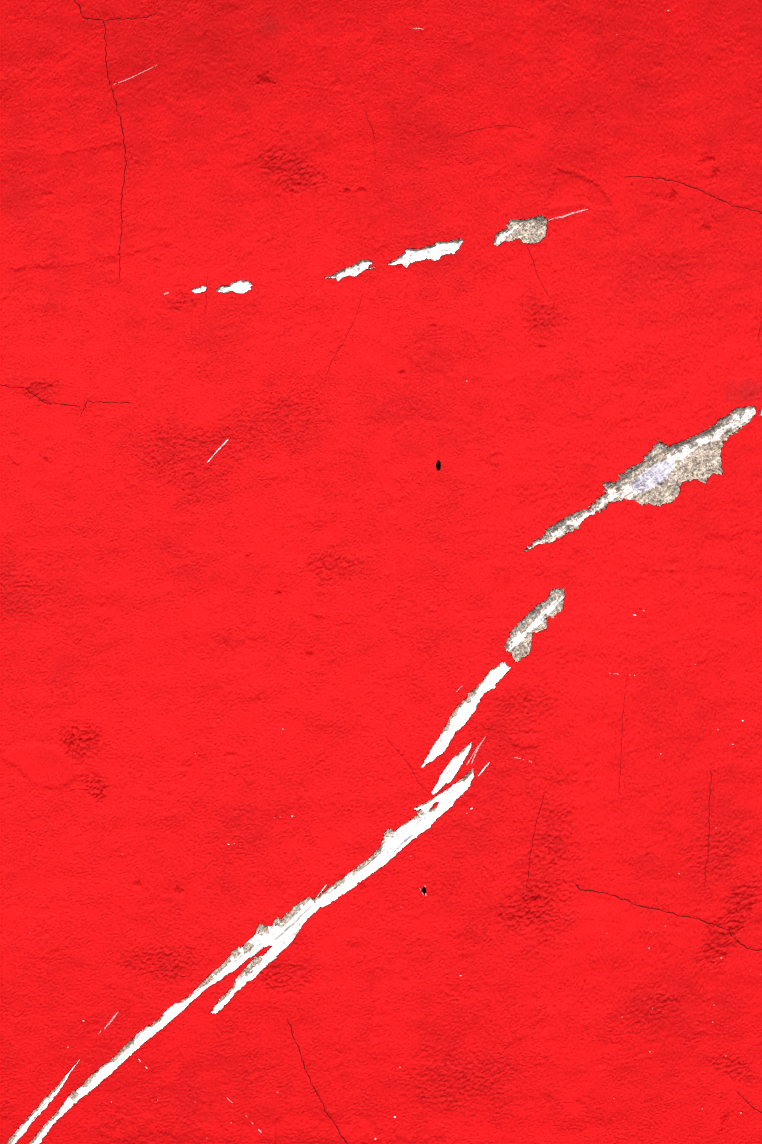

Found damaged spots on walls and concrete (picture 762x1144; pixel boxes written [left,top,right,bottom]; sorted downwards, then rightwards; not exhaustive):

peeling [192,280,252,293]
peeling [325,238,463,281]
peeling [493,216,547,246]
spalling [524,405,762,551]
peeling [179,588,565,1013]
spalling [7,1037,135,1144]